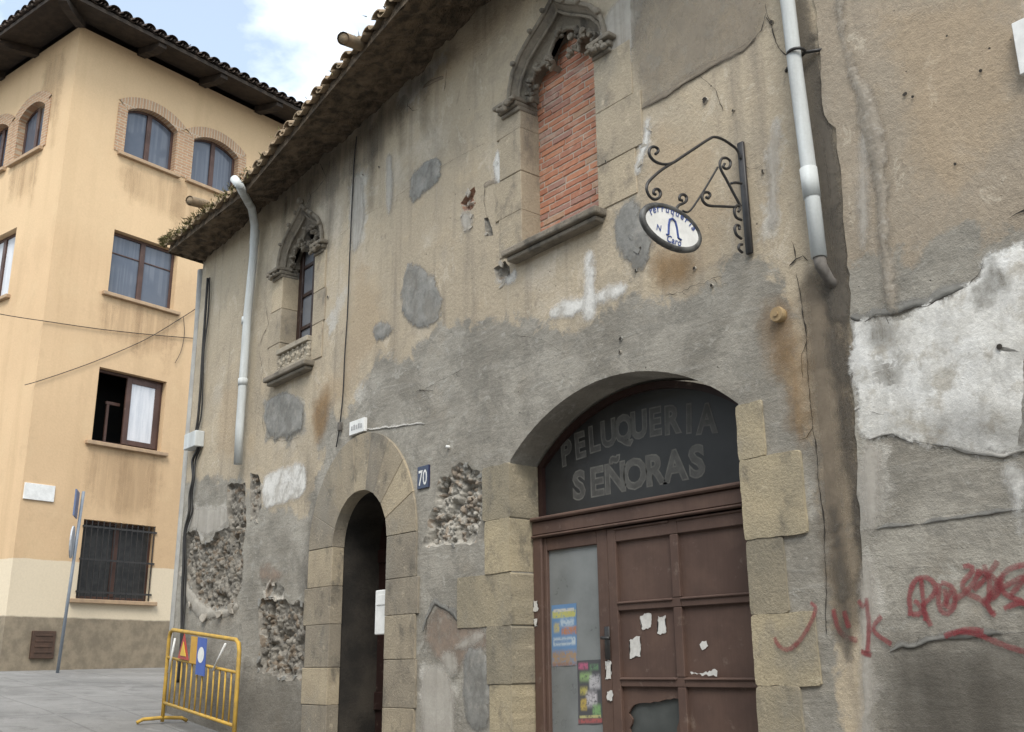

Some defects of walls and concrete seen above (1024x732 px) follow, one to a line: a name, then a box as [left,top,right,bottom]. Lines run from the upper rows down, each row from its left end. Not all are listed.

spalling [461,186,476,211]
damp [795,0,879,710]
peeling [849,242,1024,453]
spalling [178,473,263,622]
spalling [422,462,482,548]
crack [789,245,827,634]
spalling [256,579,308,681]